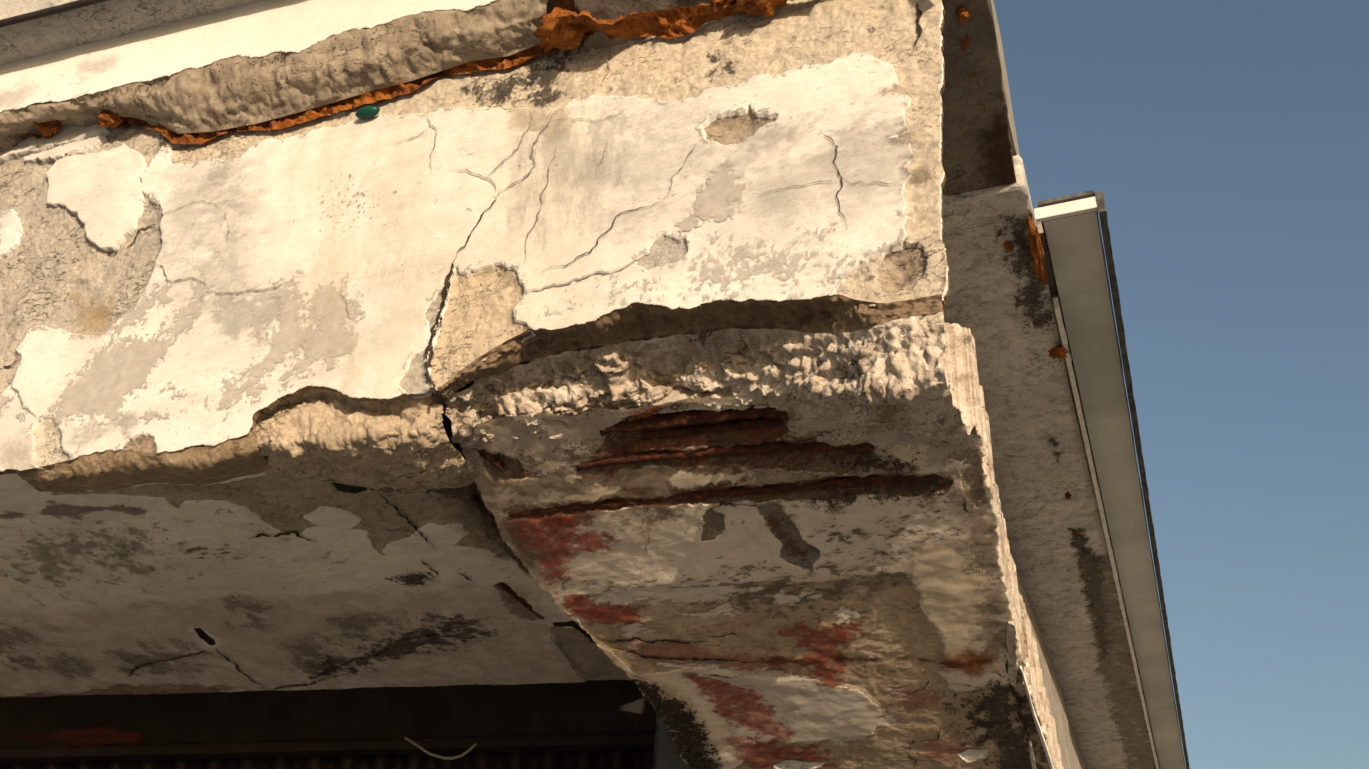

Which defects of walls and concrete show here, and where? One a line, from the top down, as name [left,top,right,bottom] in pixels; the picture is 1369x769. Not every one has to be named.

crack [753,133,898,220]
crack [398,45,701,533]
peeling [0,0,1054,769]
rust [503,405,948,527]
leakage [0,515,230,591]
crack [250,531,318,543]
leakage [385,570,434,586]
crack [377,490,471,581]
crack [125,622,486,690]
leakage [307,612,501,681]
rust [760,650,995,676]